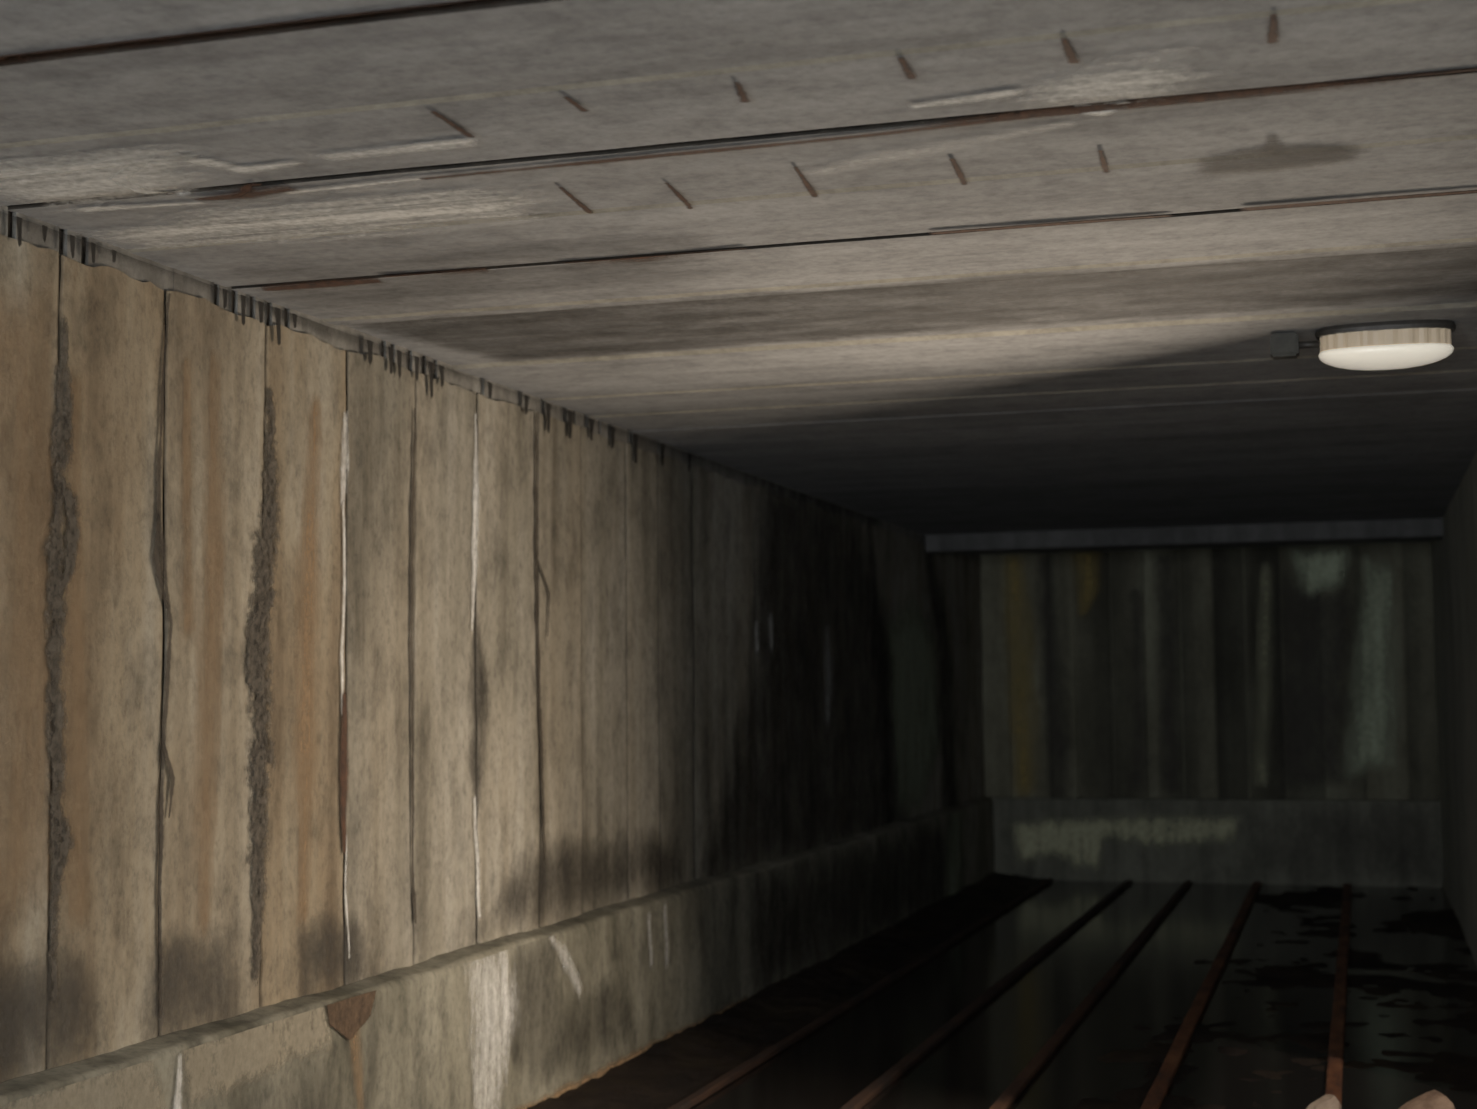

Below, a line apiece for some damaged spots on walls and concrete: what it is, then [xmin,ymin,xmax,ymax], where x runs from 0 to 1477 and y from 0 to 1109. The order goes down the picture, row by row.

rust [421,67,1477,179]
leakage [1207,140,1349,173]
crack [153,293,175,1017]
leakage [471,414,487,916]
leakage [305,873,361,979]
leakage [506,843,675,914]
leakage [1014,816,1237,867]
leakage [0,968,91,1081]